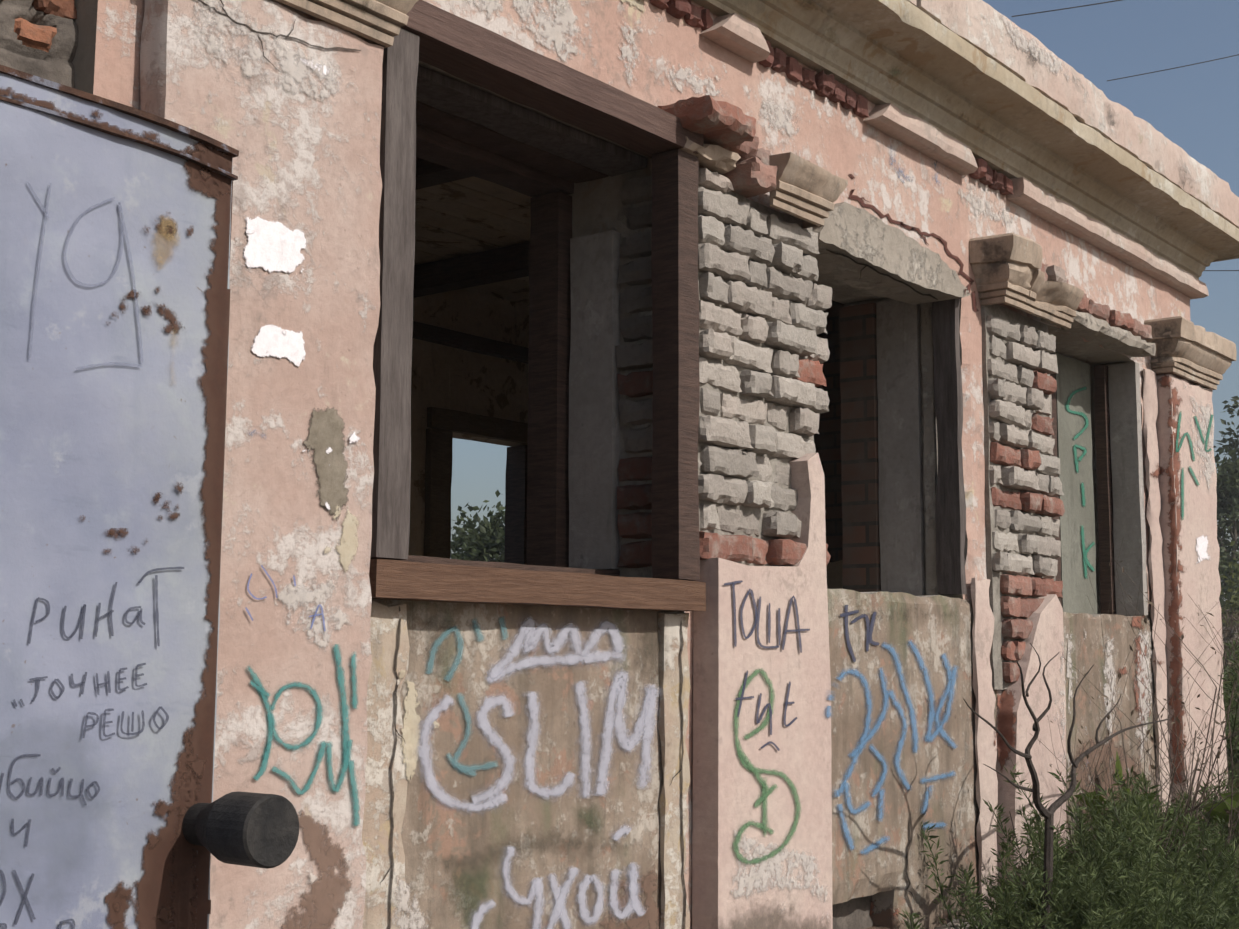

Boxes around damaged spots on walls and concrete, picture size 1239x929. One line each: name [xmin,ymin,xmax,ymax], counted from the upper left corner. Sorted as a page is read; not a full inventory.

crack [198,0,361,72]
peeling [469,0,581,62]
flaking render [619,0,713,86]
crack [826,249,937,300]
flaking render [302,407,359,520]
corrosion [0,87,232,929]